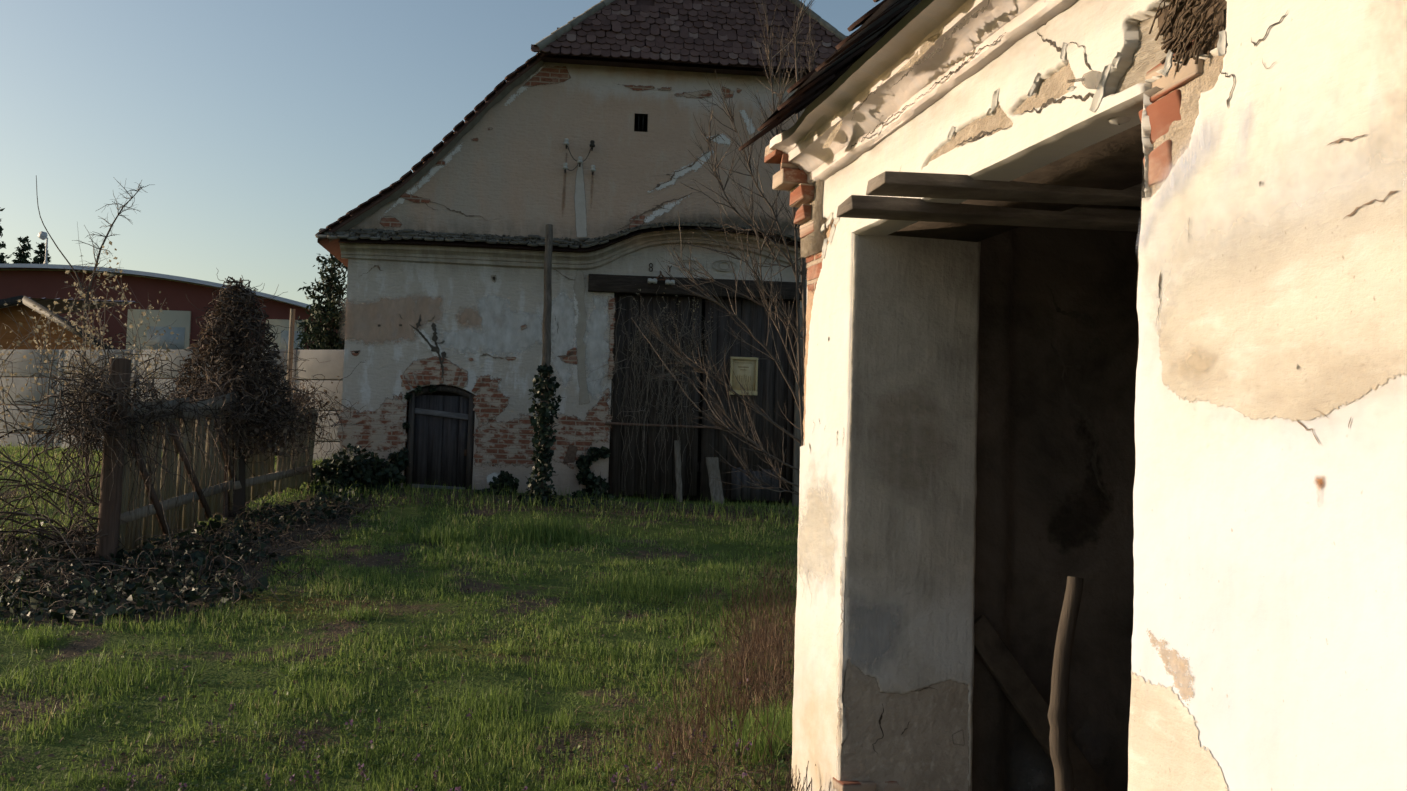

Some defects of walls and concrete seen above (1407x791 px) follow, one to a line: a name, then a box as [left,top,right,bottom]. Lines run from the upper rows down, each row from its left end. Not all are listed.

spalling [504,64,571,106]
peeling [618,84,756,136]
spalling [926,42,1076,166]
peeling [1098,52,1122,90]
spalling [1139,30,1227,197]
peeling [629,133,731,228]
peeling [334,277,616,484]
peeling [832,659,969,791]
peeling [1128,631,1228,791]